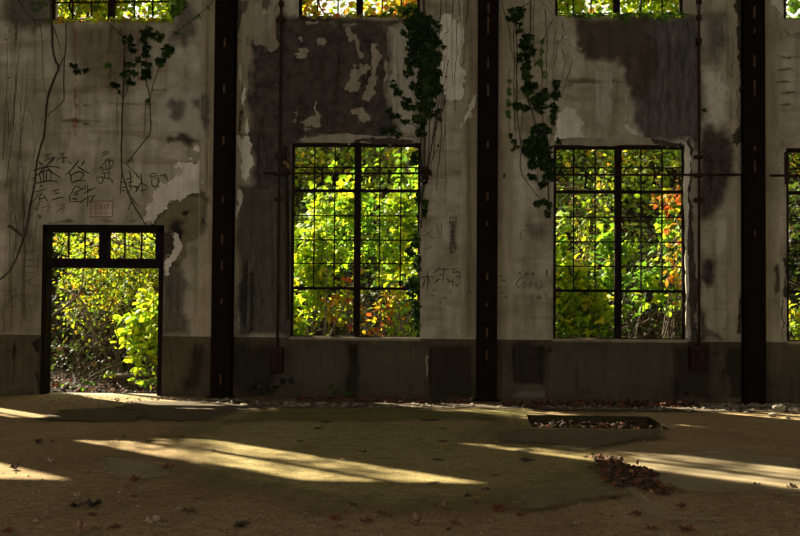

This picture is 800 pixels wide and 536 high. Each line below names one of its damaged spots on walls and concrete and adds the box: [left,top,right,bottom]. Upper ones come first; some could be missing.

flaking render [251,3,279,52]
flaking render [294,36,327,59]
flaking render [237,49,251,106]
flaking render [343,23,389,123]
flaking render [293,101,321,143]
spalling [354,137,414,146]
flaking render [460,95,476,128]
water stain [563,14,734,218]
flaking render [142,145,203,224]
flaking render [163,231,183,276]